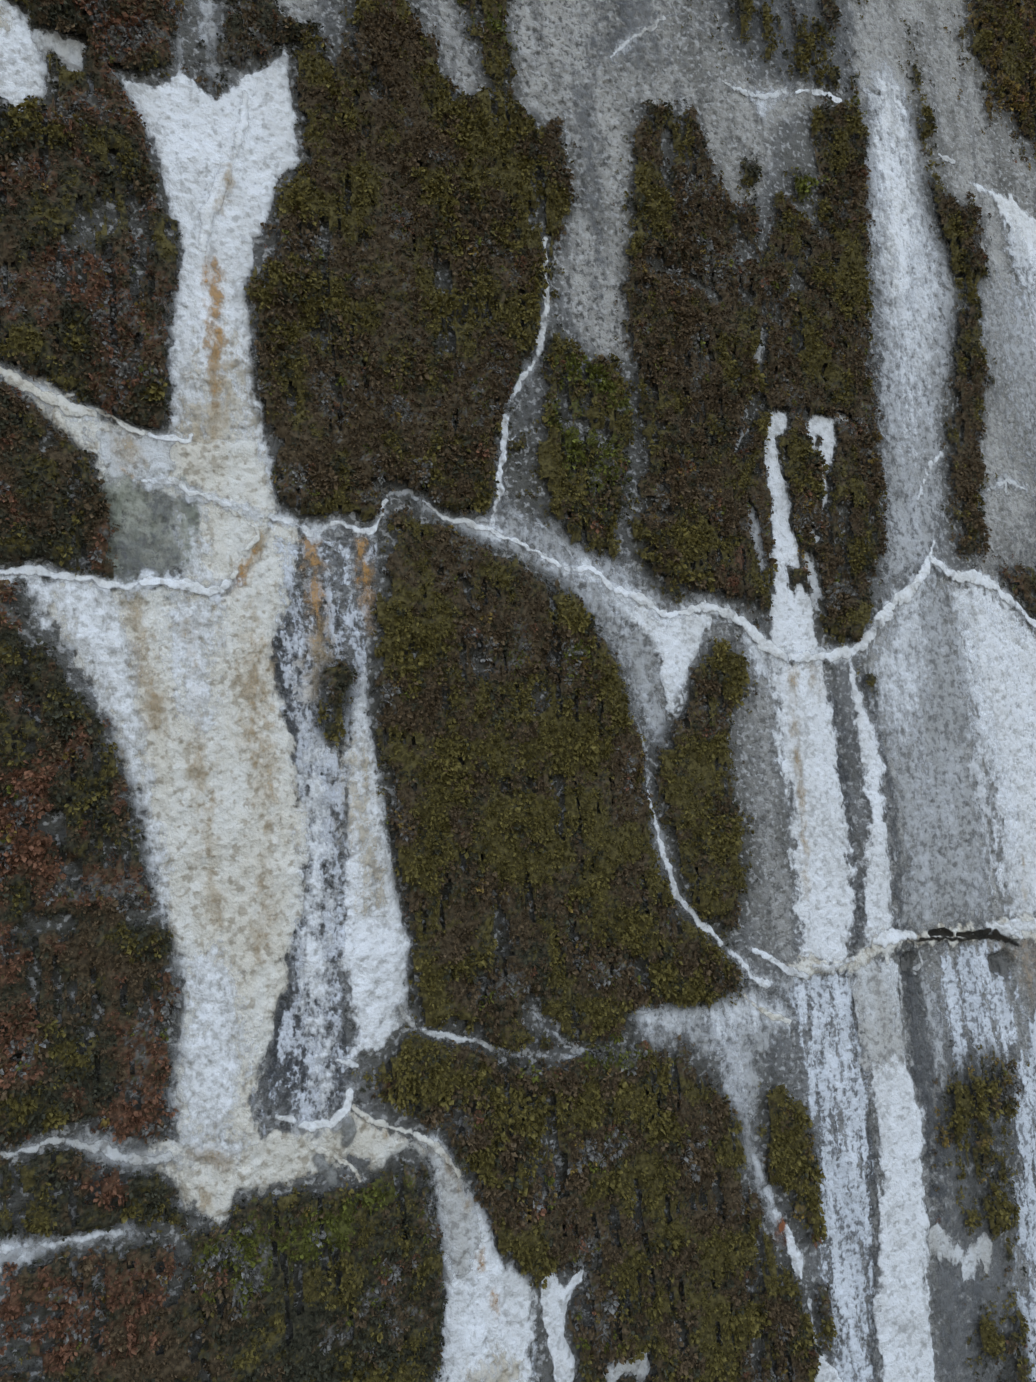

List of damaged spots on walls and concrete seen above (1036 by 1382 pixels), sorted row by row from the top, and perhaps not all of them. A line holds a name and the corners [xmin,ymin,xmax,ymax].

crack [563,112,571,155]
corrosion [204,258,224,363]
crack [0,231,1036,667]
corrosion [304,537,325,613]
leakage [0,0,584,1382]
leakage [433,0,1036,1382]
crack [641,733,809,1024]
crack [907,935,1000,975]
crack [394,999,592,1060]
crack [0,1124,182,1174]
crack [275,1058,461,1182]
crack [0,1225,135,1273]